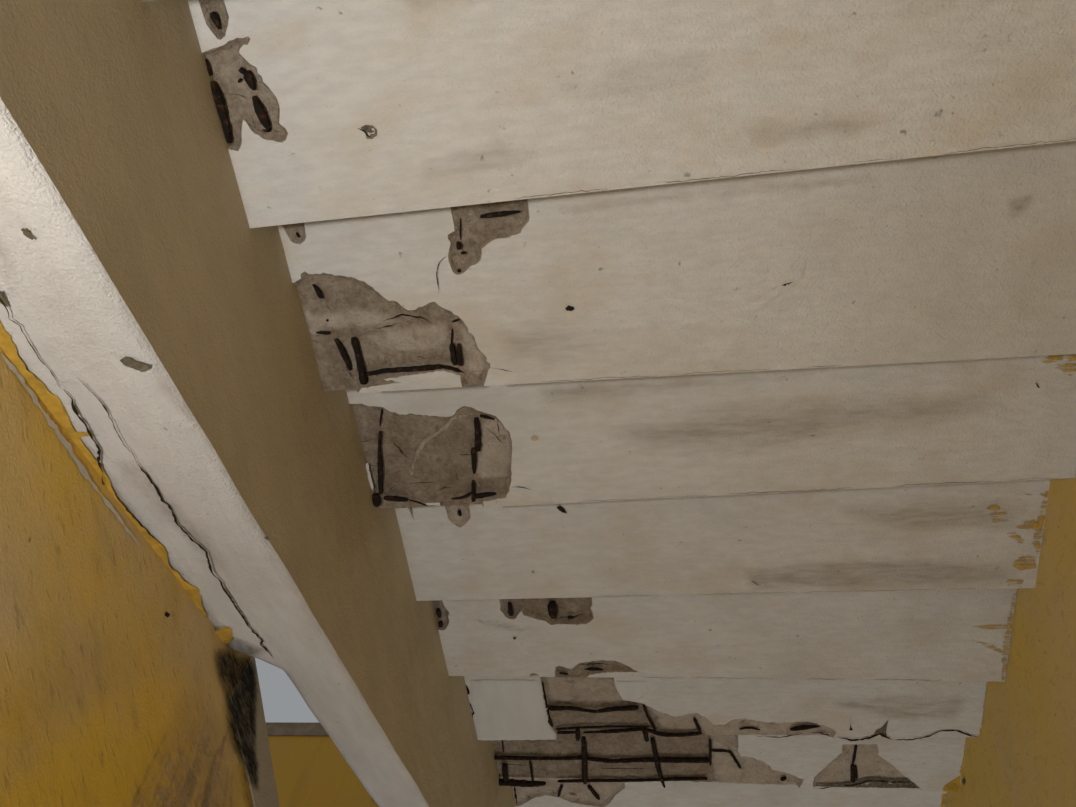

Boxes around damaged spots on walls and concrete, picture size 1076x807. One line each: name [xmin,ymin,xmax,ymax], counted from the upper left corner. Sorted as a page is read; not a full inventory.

spalling [198,0,288,151]
spalling [448,199,530,275]
spalling [294,271,512,528]
crack [0,300,272,656]
spalling [499,597,594,625]
spalling [492,660,922,807]
crack [838,730,977,741]